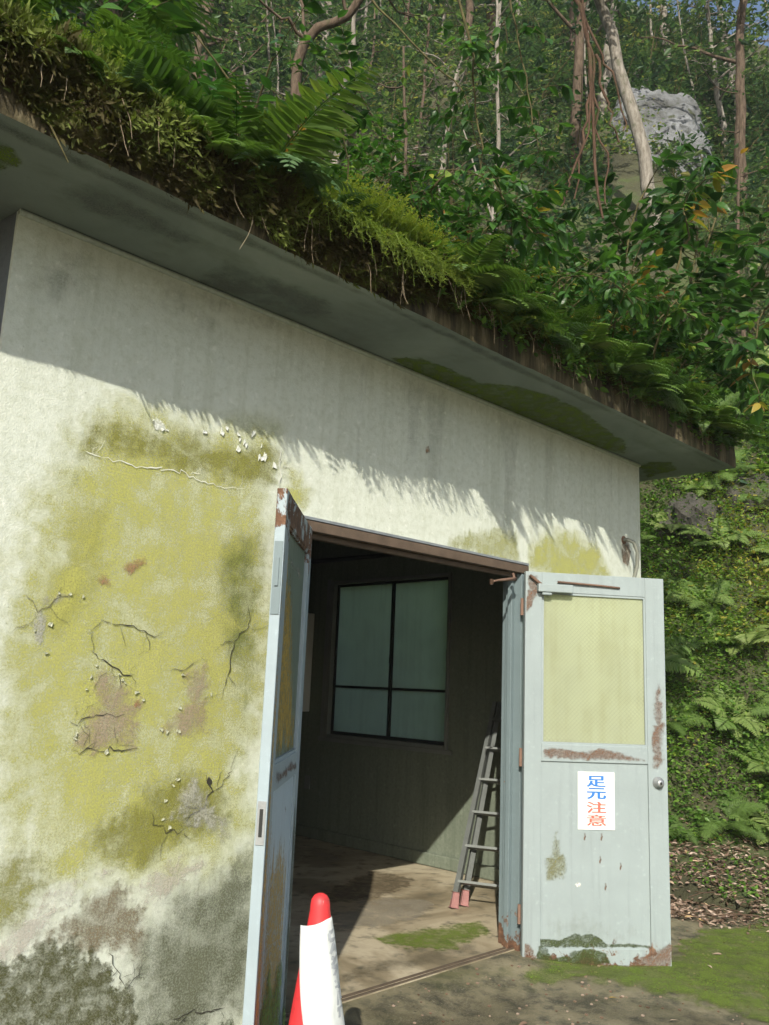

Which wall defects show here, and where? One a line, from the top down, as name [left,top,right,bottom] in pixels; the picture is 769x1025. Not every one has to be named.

crack [86,444,243,495]
spalling [220,426,277,469]
crack [12,587,79,632]
crack [71,620,164,755]
crack [172,608,264,701]
rust [544,749,639,760]
rust [652,689,664,766]
leakage [0,861,251,1025]